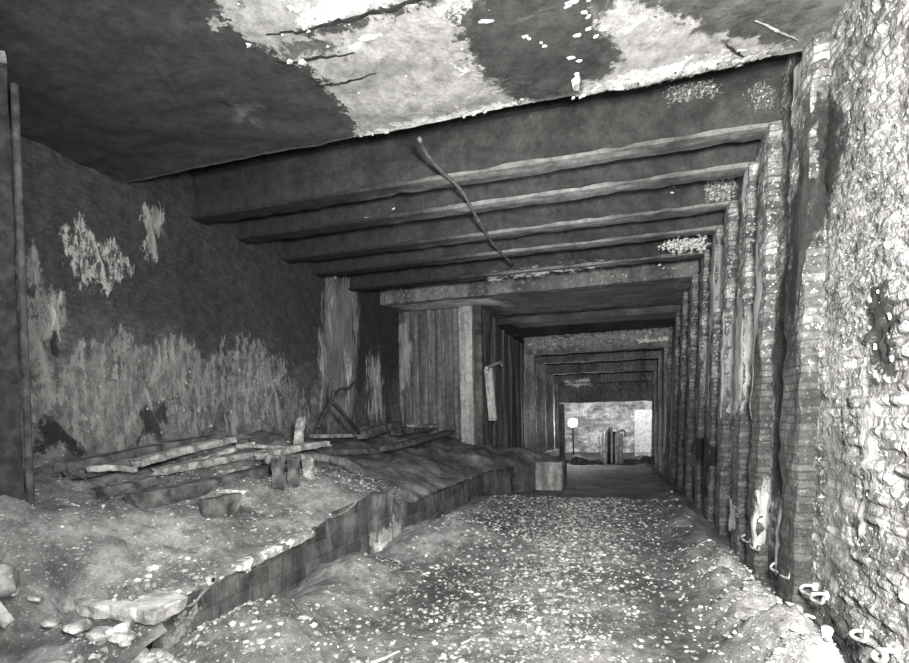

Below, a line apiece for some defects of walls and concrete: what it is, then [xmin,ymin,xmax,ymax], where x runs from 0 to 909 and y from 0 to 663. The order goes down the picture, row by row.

peeling [206,0,537,137]
damp [791,47,805,110]
peeling [59,202,166,298]
peeling [15,239,319,453]
damp [750,66,909,571]
damp [829,574,843,609]